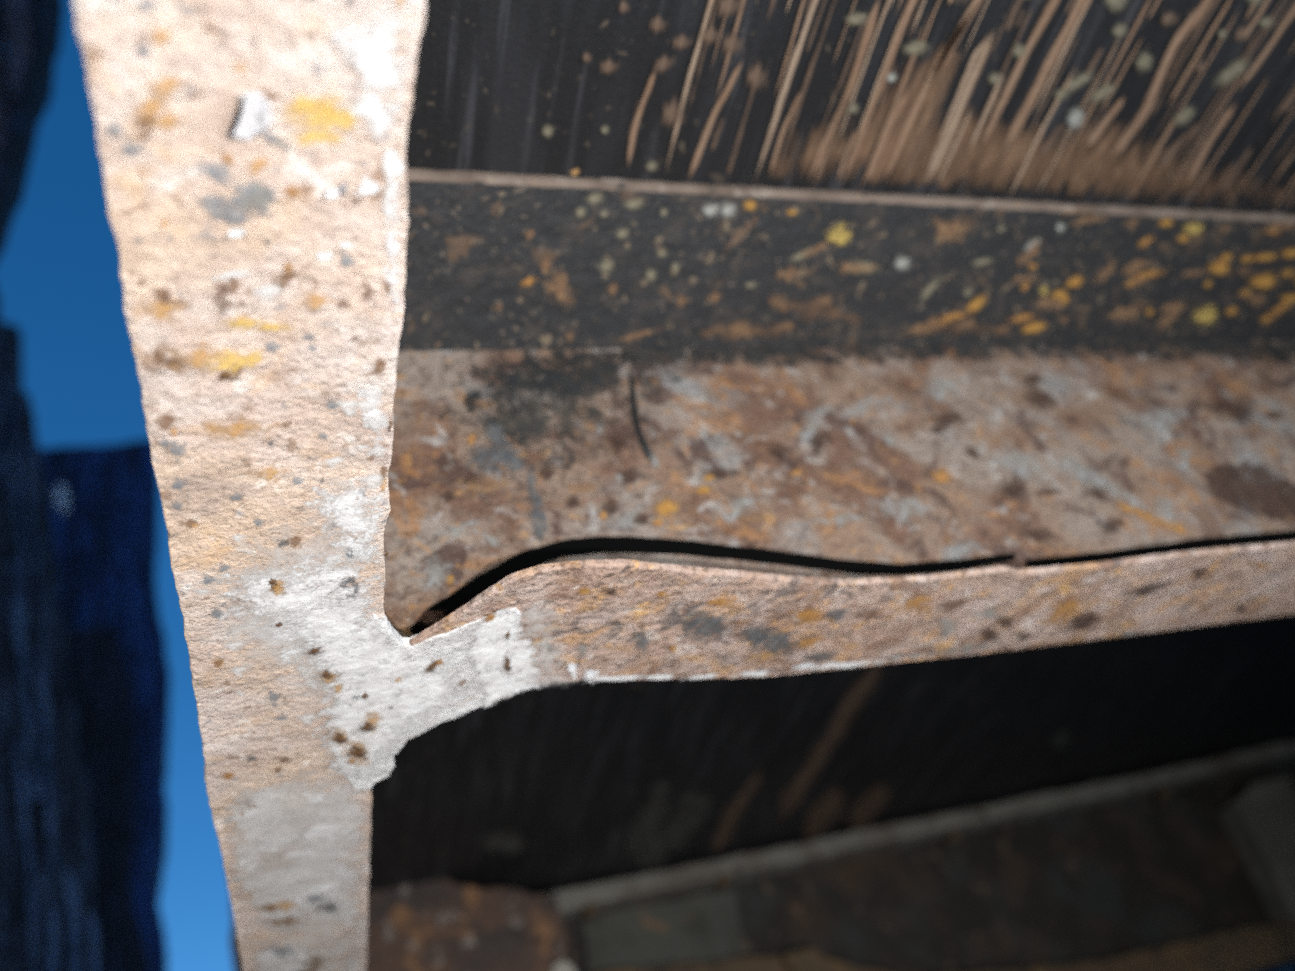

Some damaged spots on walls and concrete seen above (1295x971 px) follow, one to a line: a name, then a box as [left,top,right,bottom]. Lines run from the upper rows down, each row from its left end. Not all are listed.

corrosion [702,297,856,340]
corrosion [1203,461,1295,525]
crack [411,530,1295,635]